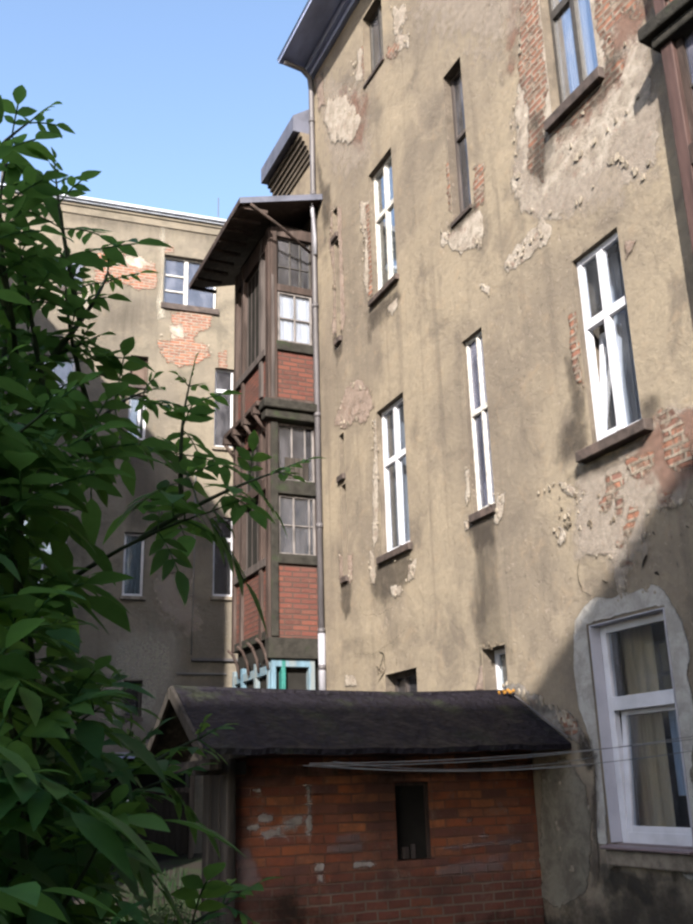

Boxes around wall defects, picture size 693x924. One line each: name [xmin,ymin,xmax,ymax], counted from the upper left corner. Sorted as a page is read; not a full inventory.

peeling [386,3,410,60]
peeling [315,46,370,177]
peeling [504,0,660,273]
flaking render [94,250,158,291]
spalling [440,163,485,256]
flaking render [157,311,228,368]
peeling [334,379,379,552]
peeling [537,406,693,599]